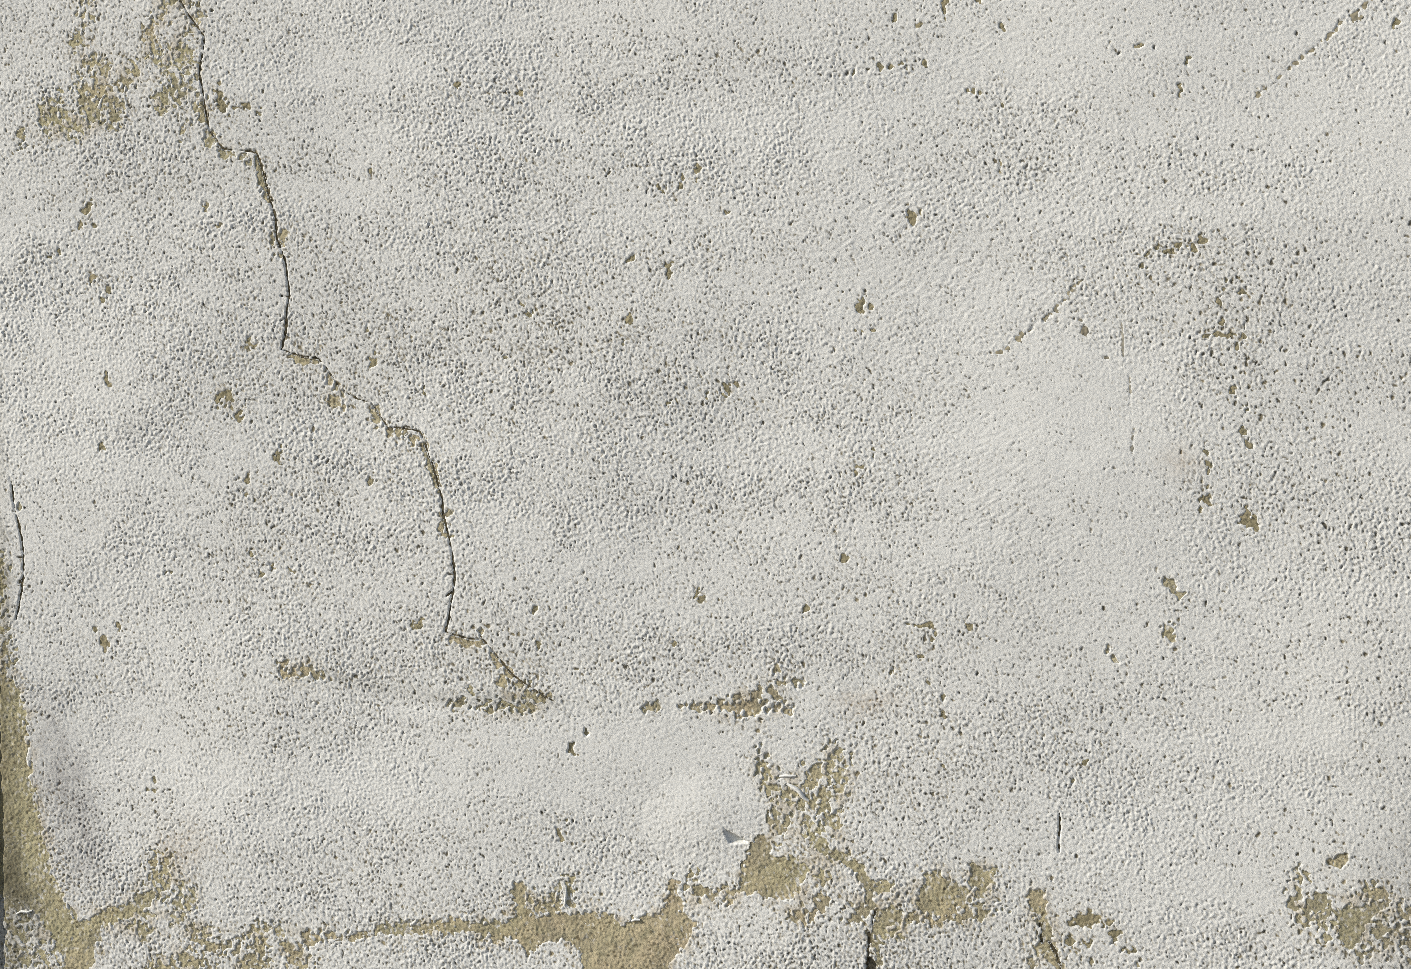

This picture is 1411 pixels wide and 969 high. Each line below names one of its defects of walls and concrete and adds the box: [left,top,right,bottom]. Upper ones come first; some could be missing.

peeling [16,0,262,151]
crack [179,0,553,716]
peeling [1163,577,1186,601]
peeling [1159,621,1176,643]
peeling [0,550,1011,969]
peeling [1326,853,1348,869]
crack [866,911,877,969]
peeling [1026,889,1140,969]
peeling [1283,863,1411,965]